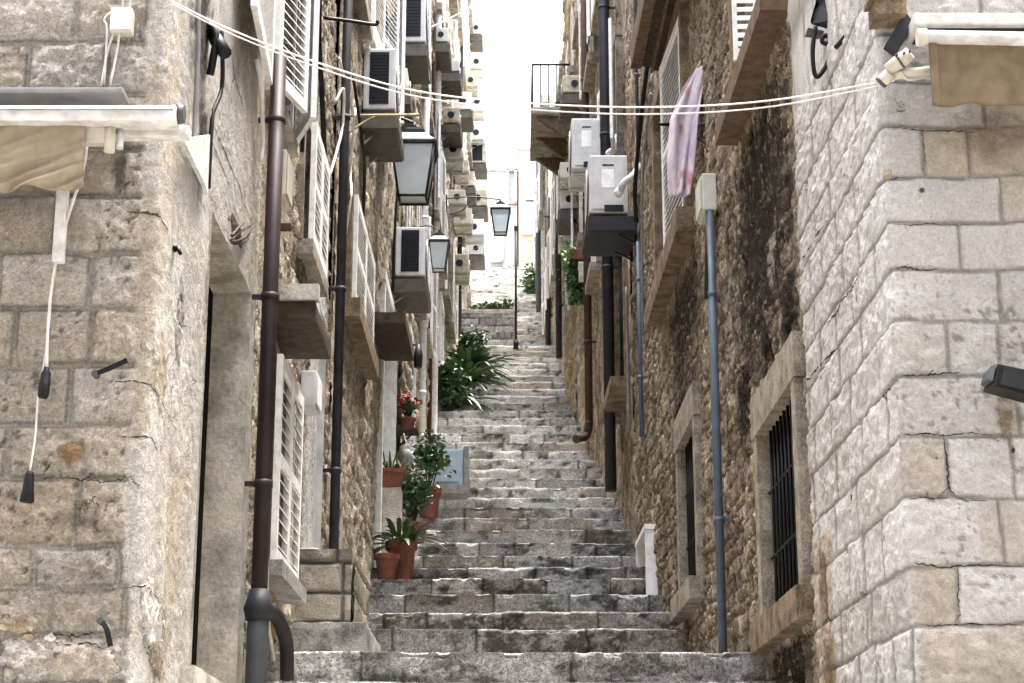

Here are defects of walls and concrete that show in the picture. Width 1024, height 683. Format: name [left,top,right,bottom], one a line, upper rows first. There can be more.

crack [128,211,168,231]
water stain [730,56,797,441]
crack [115,380,178,450]
crack [37,461,139,514]
crack [905,432,1003,501]
crack [916,563,1019,627]
crack [53,632,97,643]